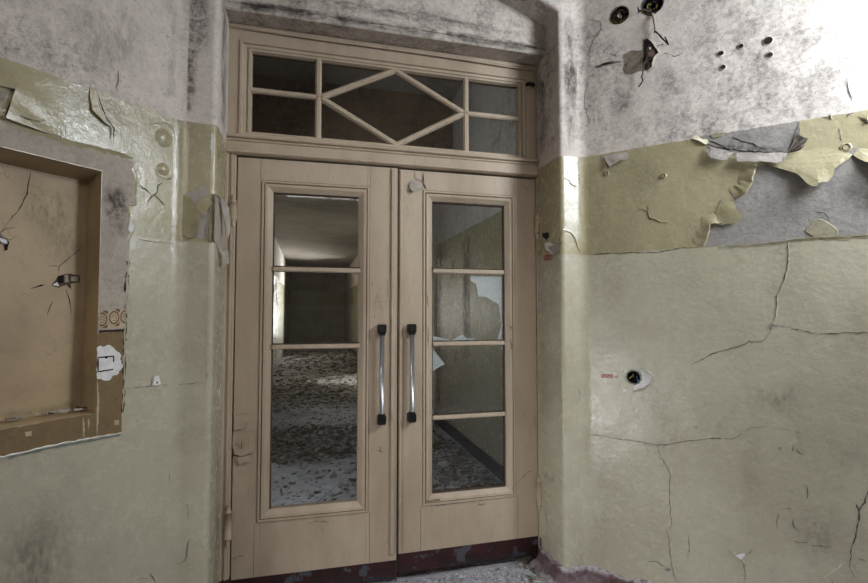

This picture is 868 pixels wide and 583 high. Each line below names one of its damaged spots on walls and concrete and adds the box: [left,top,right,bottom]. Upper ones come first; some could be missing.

leakage [243,2,312,15]
crack [30,244,86,315]
peeling [0,51,138,459]
peeling [182,185,231,265]
peeling [692,121,868,249]
crack [693,242,868,364]
crack [596,426,803,583]
crack [777,482,868,583]